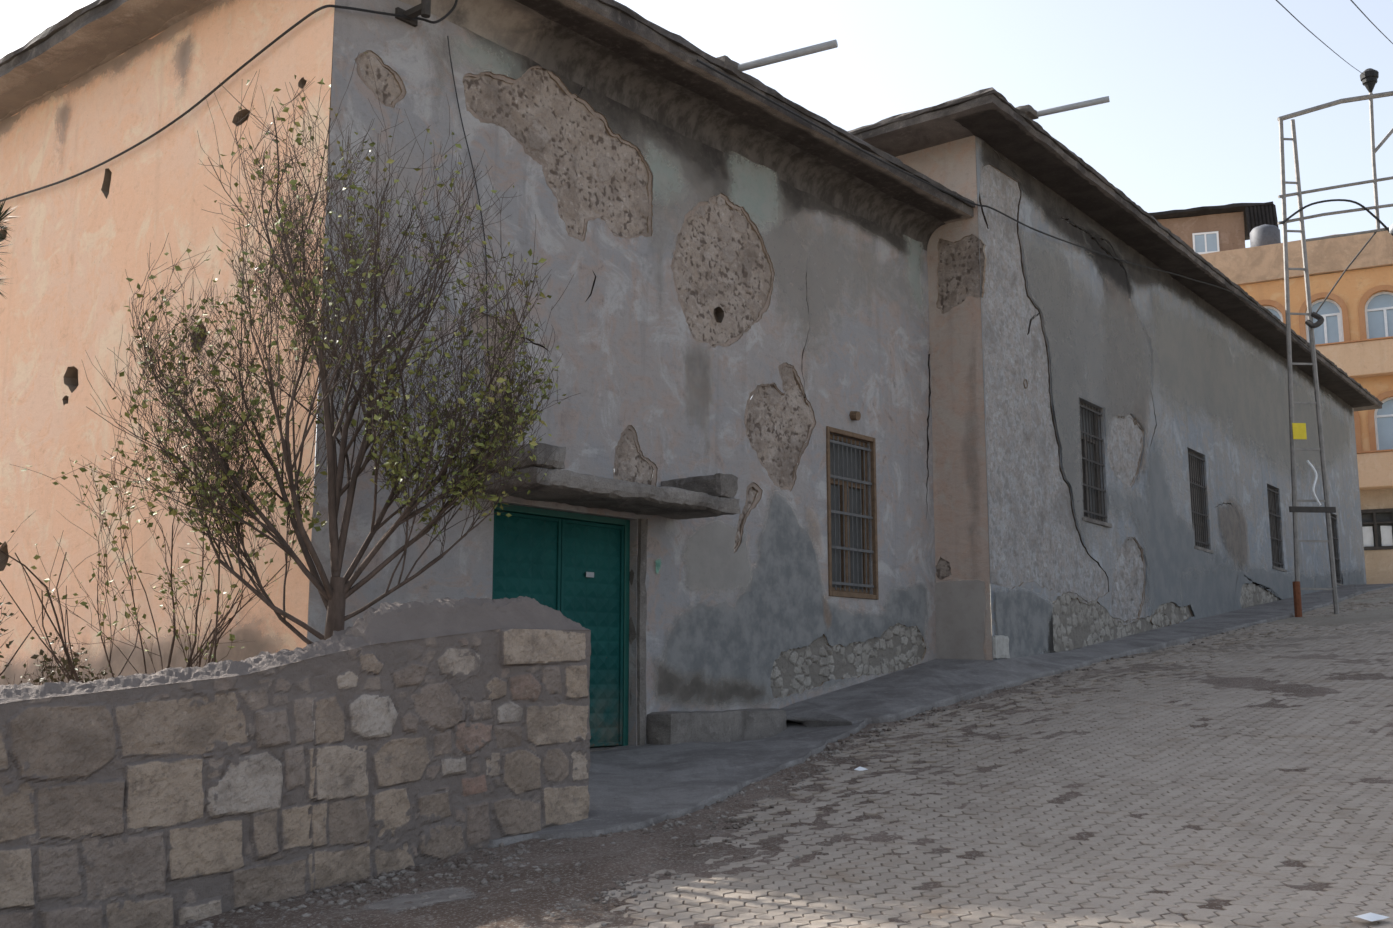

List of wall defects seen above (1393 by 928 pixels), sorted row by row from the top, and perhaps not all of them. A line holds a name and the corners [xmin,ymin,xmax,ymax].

spalling [354,50,406,108]
spalling [462,66,653,242]
spalling [671,193,775,348]
spalling [613,425,658,486]
spalling [734,363,816,553]
peeling [936,164,1146,625]
crack [979,182,1109,592]
leakage [656,663,765,706]